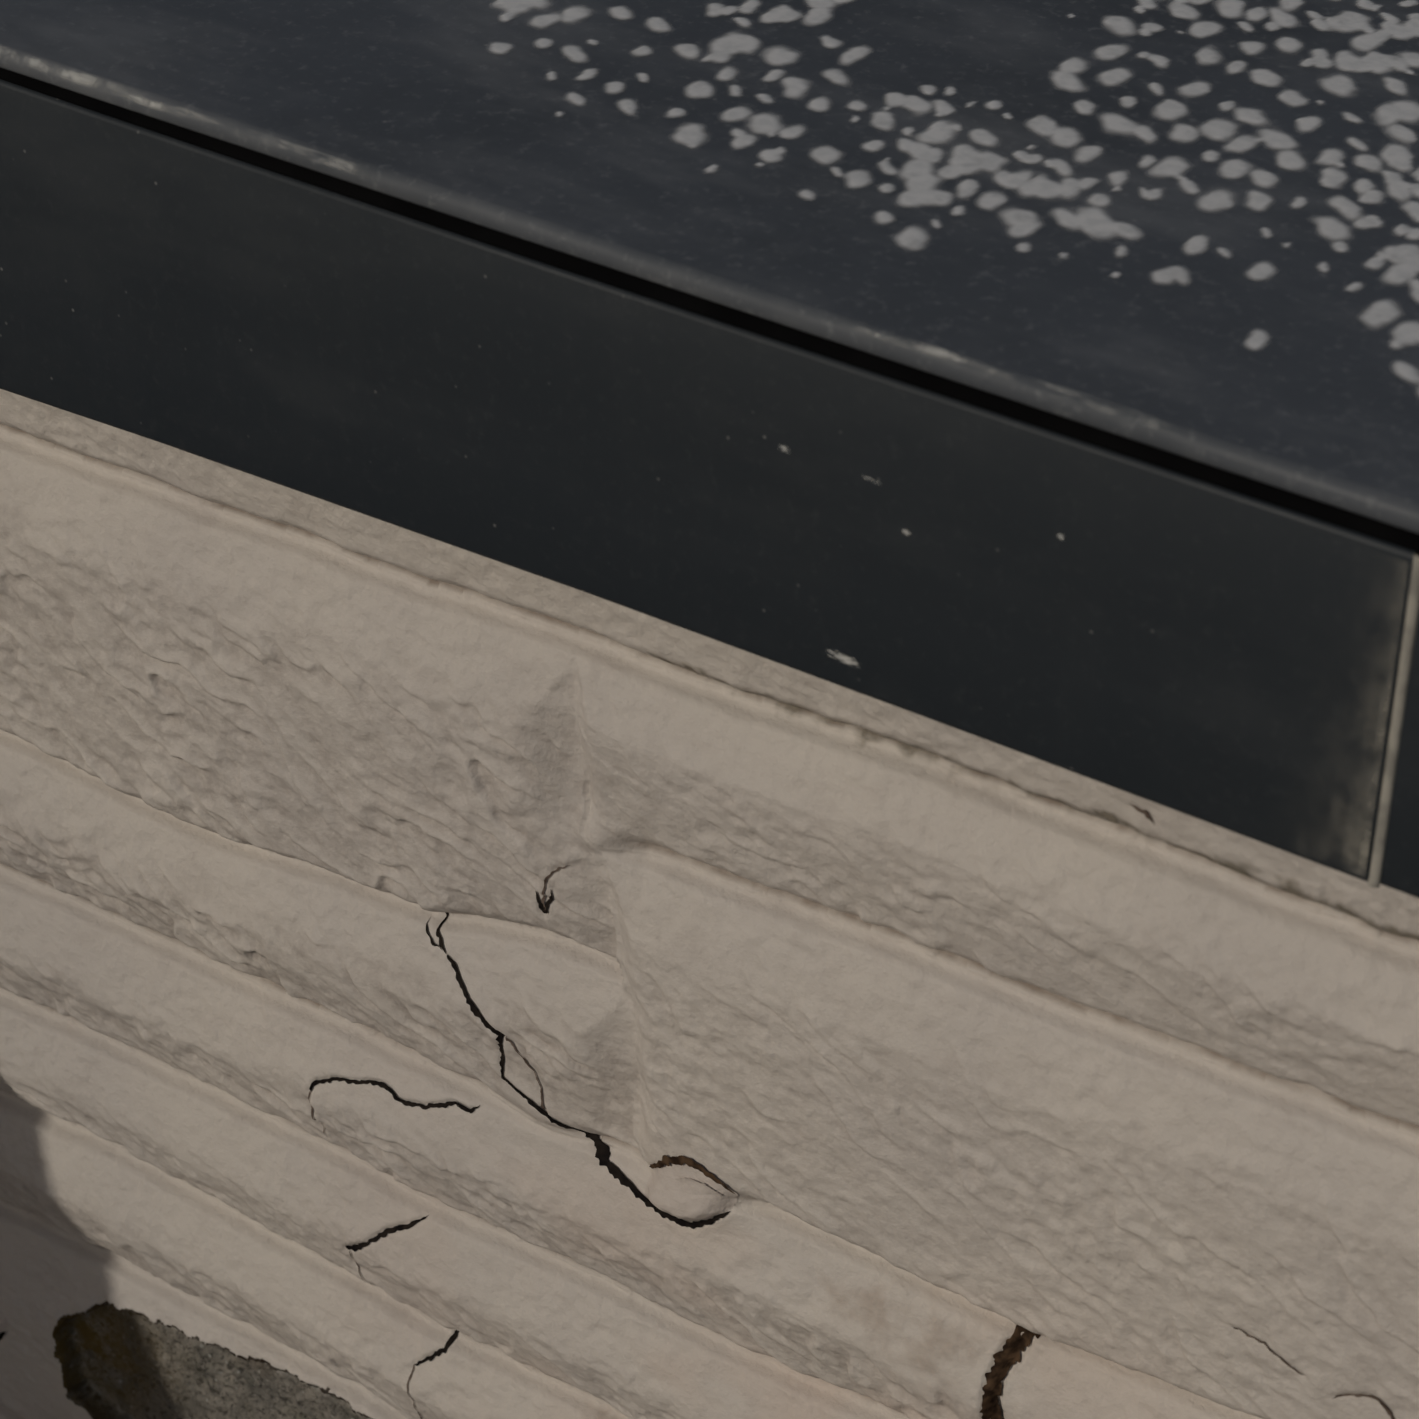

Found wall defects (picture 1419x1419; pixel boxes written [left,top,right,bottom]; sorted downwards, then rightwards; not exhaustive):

crack [536,865,570,913]
crack [308,1077,480,1133]
crack [426,912,731,1229]
crack [346,1216,427,1282]
spalling [52,1300,372,1419]
crack [407,1330,459,1419]
crack [980,1325,1040,1419]